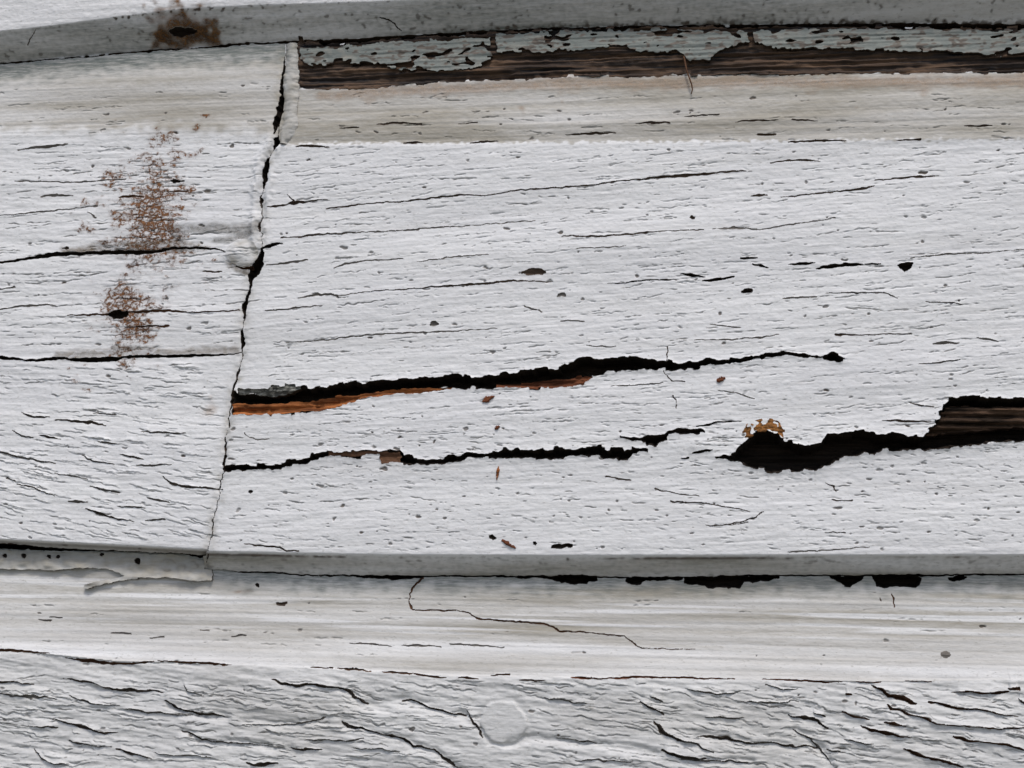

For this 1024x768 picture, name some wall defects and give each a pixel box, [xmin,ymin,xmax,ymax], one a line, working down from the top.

rust [153,0,221,49]
peeling [300,27,1024,73]
rust [81,127,202,368]
crack [0,246,240,328]
crack [0,352,242,363]
crack [224,254,999,526]
crack [244,543,299,552]
crack [789,531,870,553]
crack [311,577,692,682]
crack [571,674,735,682]
crack [762,676,932,684]